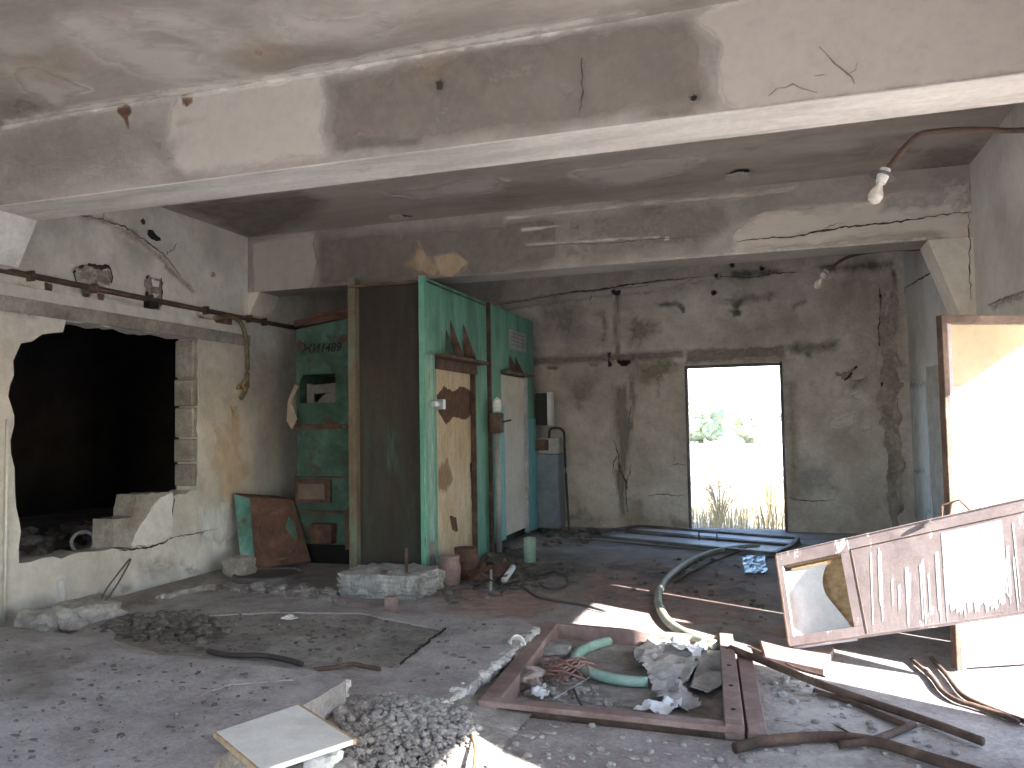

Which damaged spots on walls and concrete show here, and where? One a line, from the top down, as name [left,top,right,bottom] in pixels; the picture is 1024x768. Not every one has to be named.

crack [768,46,858,96]
corrosion [117,104,131,129]
corrosion [181,93,192,107]
spalling [73,263,113,287]
crack [80,215,181,276]
crack [503,272,795,305]
crack [738,211,1024,306]
peeling [835,288,906,527]
crack [613,407,687,512]
crack [119,498,217,551]